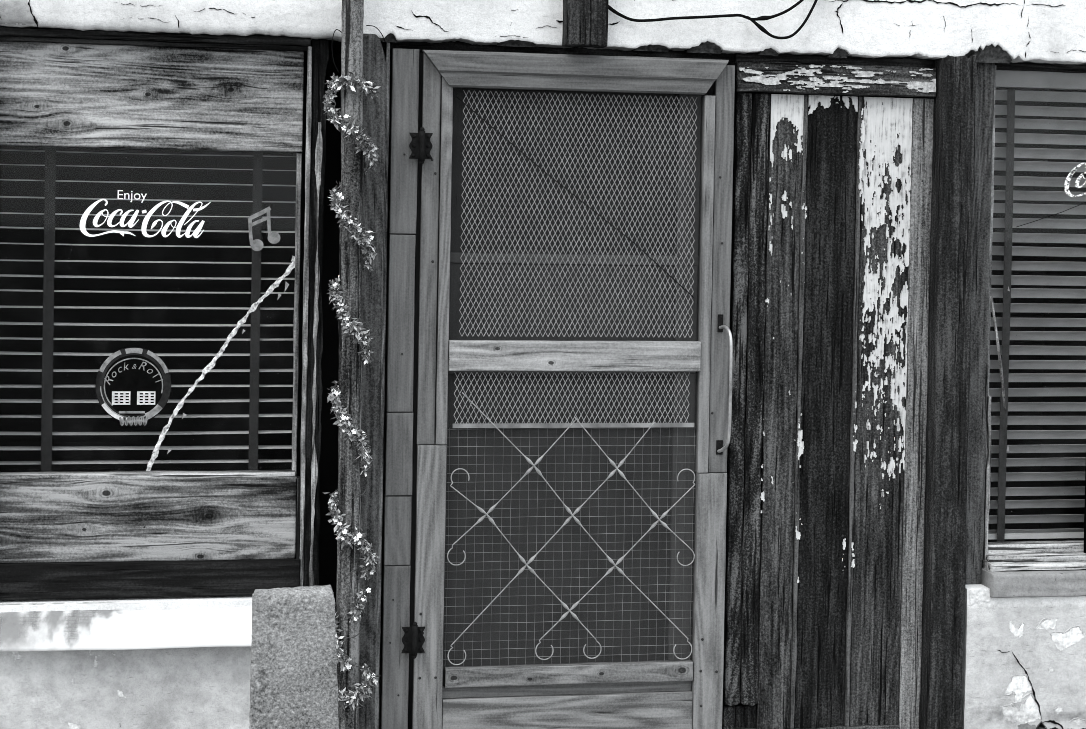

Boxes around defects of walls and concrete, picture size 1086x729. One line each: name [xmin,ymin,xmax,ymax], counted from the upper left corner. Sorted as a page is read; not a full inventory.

crack [829,0,1086,58]
peeling [739,48,936,509]
peeling [1009,618,1086,651]
peeling [1002,674,1047,729]
crack [998,650,1086,729]